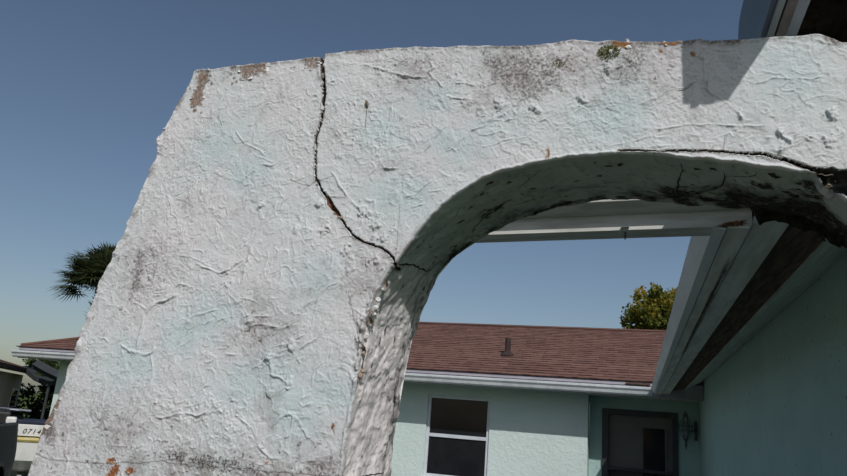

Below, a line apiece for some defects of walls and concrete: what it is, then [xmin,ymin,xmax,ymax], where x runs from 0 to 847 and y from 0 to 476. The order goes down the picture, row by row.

peeling [190,68,212,113]
crack [294,56,441,275]
crack [618,139,833,195]
leakage [632,186,717,207]
leakage [733,173,839,226]
corrosion [106,457,135,476]